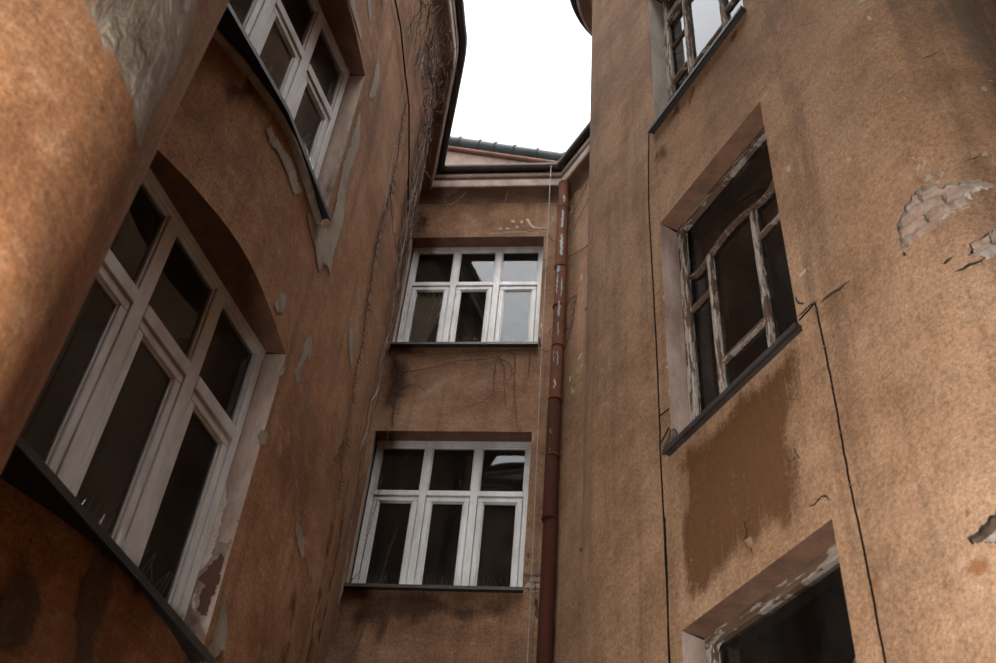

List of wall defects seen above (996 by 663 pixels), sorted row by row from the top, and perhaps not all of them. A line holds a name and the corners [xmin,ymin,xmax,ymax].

flaking render [83,0,198,150]
flaking render [896,151,996,256]
flaking render [943,228,996,273]
peeling [191,484,228,616]
damp [683,354,800,600]
spalling [967,510,996,545]